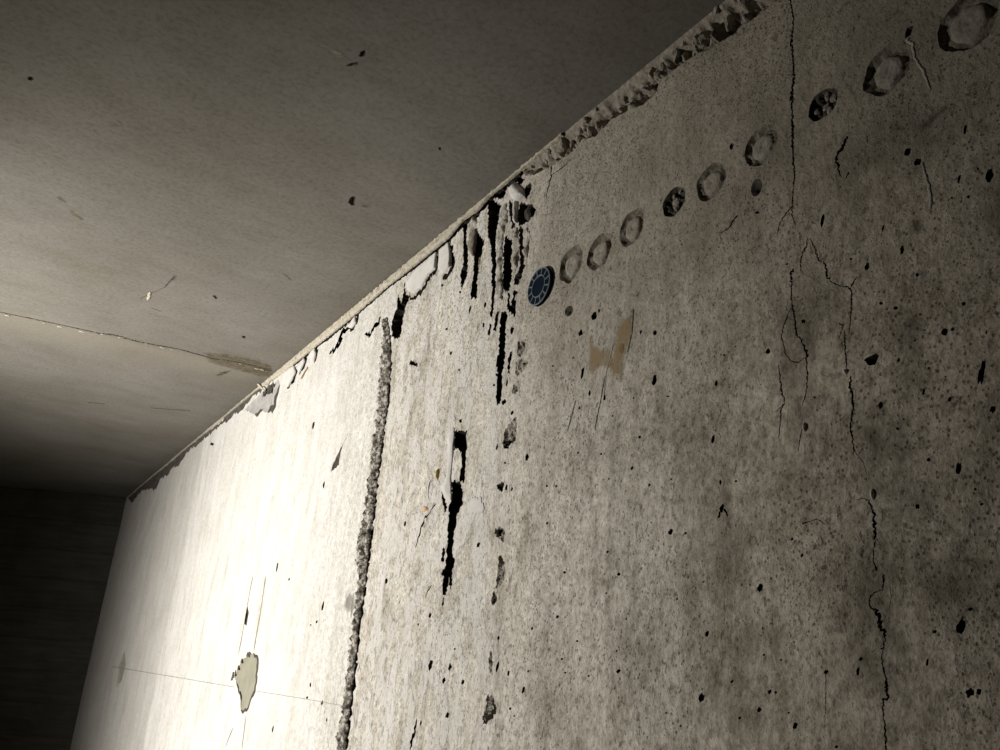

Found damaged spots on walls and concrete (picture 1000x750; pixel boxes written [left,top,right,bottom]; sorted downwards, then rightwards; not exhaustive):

spalling [522,0,777,176]
leakage [508,182,526,223]
spalling [751,179,762,196]
peeling [391,241,455,339]
spalling [512,339,528,394]
crack [777,0,892,750]
peeling [128,346,318,503]
spalling [502,417,517,449]
peeling [435,428,485,606]
spalling [231,652,258,714]